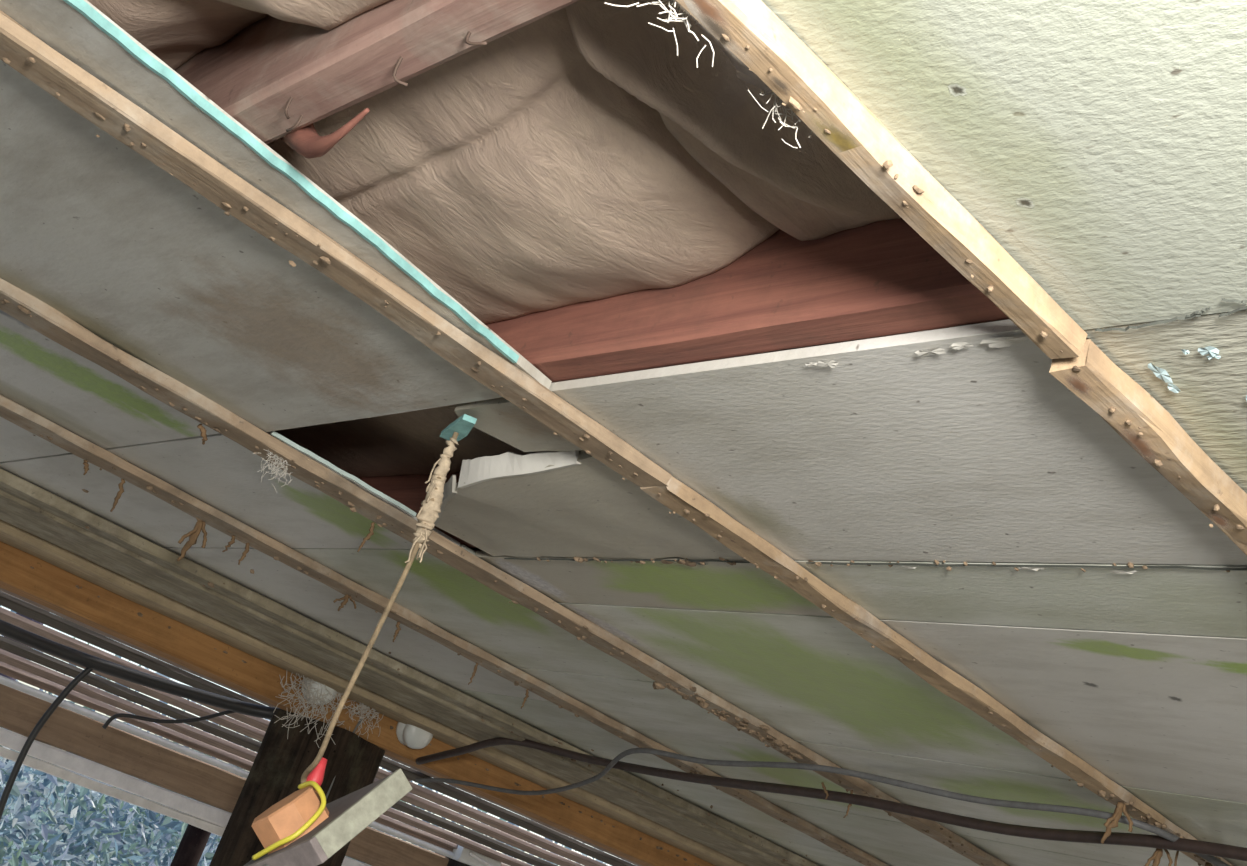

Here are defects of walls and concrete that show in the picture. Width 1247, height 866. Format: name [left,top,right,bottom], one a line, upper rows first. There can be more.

spalling [63,0,519,363]
crack [1095,298,1247,332]